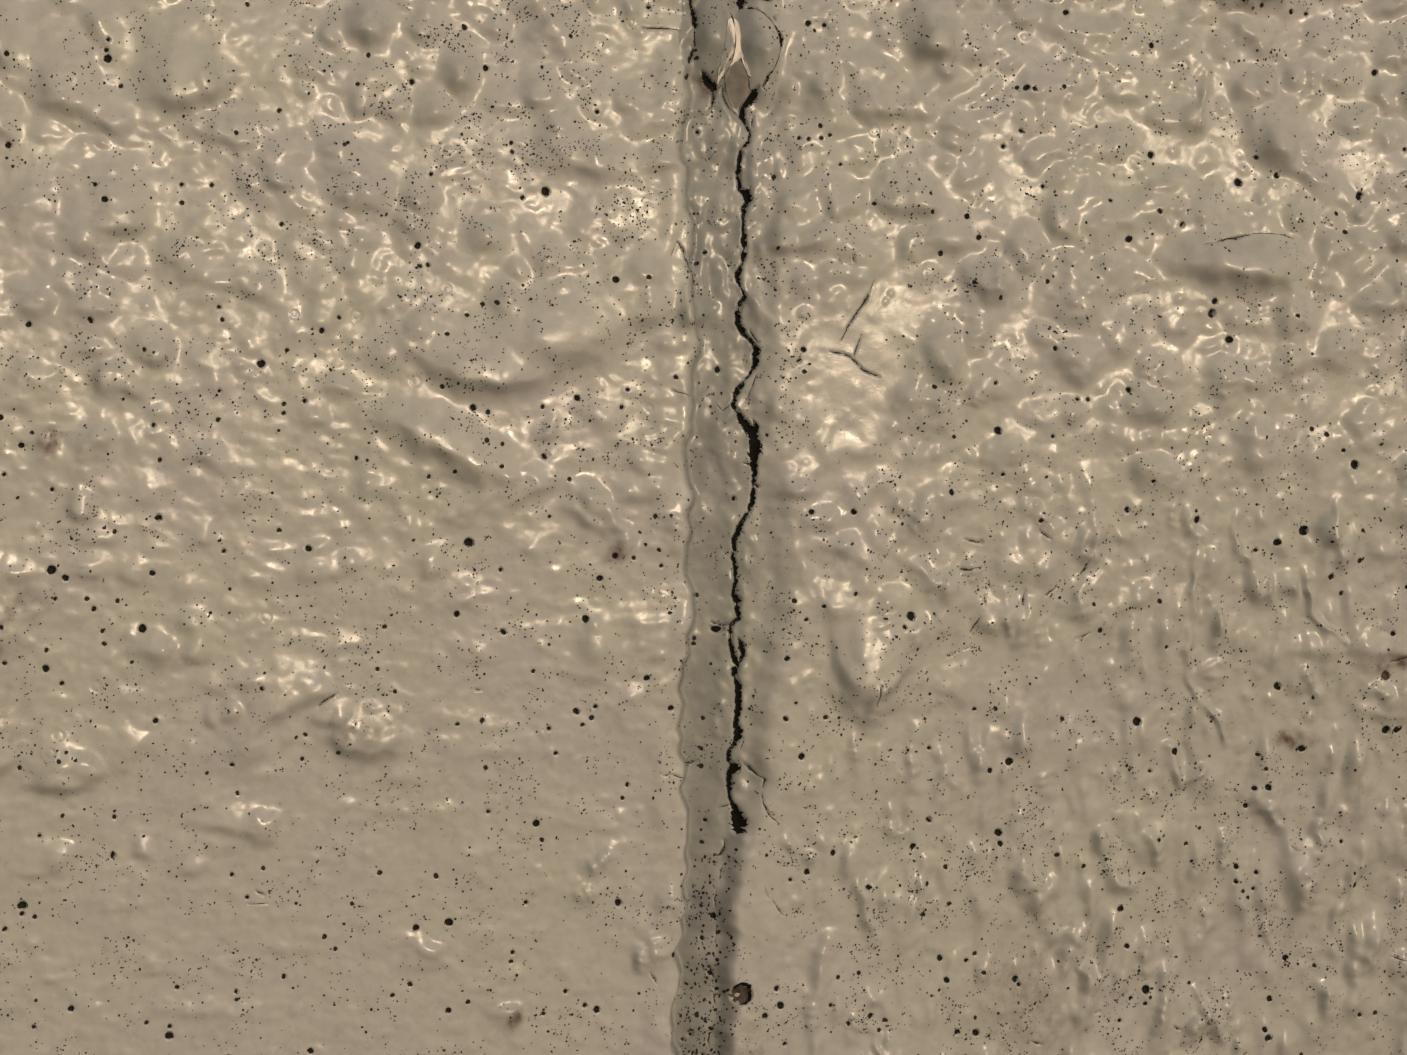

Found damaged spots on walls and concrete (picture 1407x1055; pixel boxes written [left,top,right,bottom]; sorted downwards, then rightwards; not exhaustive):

crack [642,0,784,1043]